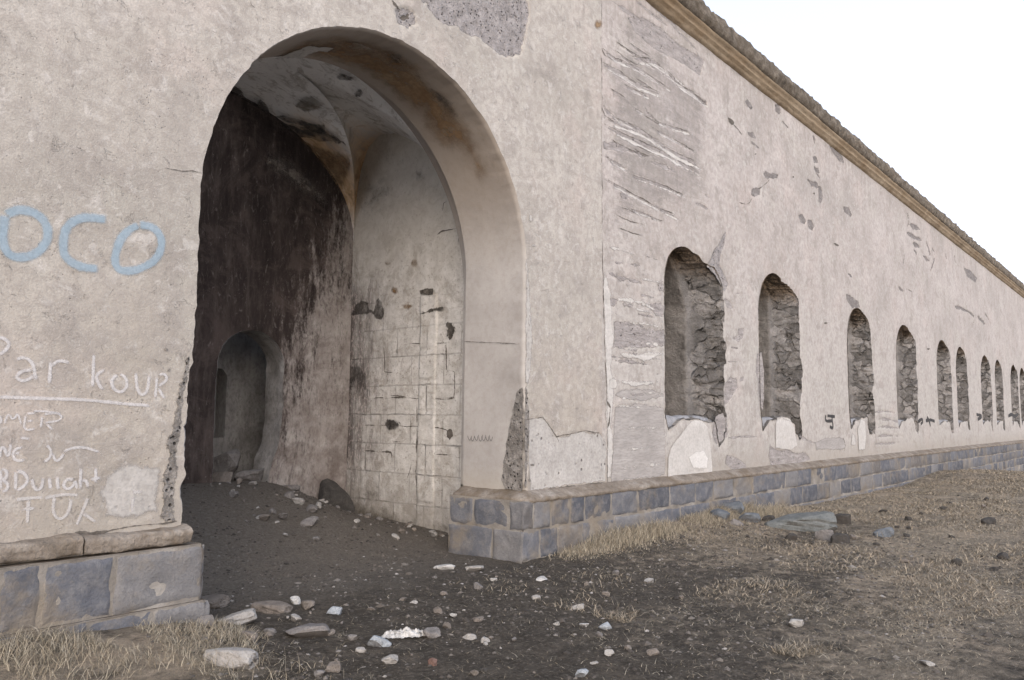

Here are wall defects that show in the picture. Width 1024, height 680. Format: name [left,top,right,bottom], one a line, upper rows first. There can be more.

flaking render [422,0,529,57]
peeling [603,1,709,209]
peeling [608,181,677,236]
flaking render [739,171,778,204]
flaking render [807,156,823,203]
peeling [610,256,665,365]
peeling [100,357,189,521]
crack [518,338,611,489]
peeling [502,378,665,491]